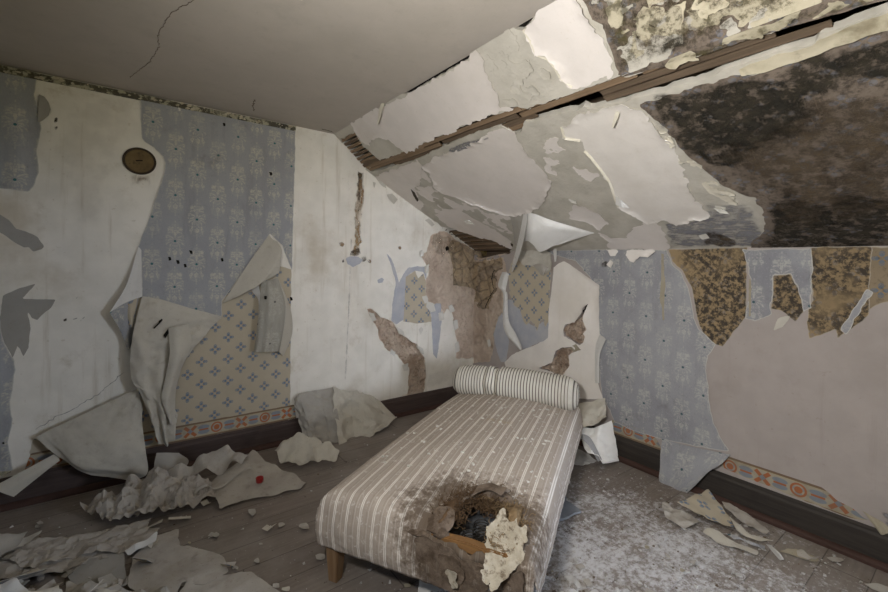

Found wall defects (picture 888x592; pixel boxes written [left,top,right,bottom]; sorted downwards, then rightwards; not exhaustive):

crack [130,0,194,78]
water stain [597,0,725,64]
peeling [342,0,886,363]
water stain [656,41,888,248]
spalling [367,309,426,396]
spalling [542,314,586,375]